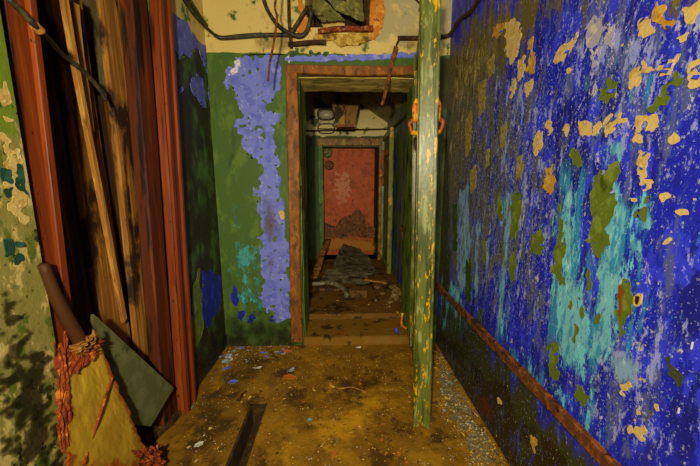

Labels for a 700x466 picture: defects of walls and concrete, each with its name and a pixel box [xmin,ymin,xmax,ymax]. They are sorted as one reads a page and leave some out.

peeling [491,17,536,98]
peeling [3,238,26,265]
peeling [0,132,30,225]
peeling [223,0,416,323]
peeling [496,192,524,239]
peeling [533,120,553,156]
peeling [542,164,556,195]
peeling [551,204,567,286]
peeling [586,161,621,258]
peeling [553,0,700,222]
peeling [614,279,639,337]
peeling [627,409,647,442]